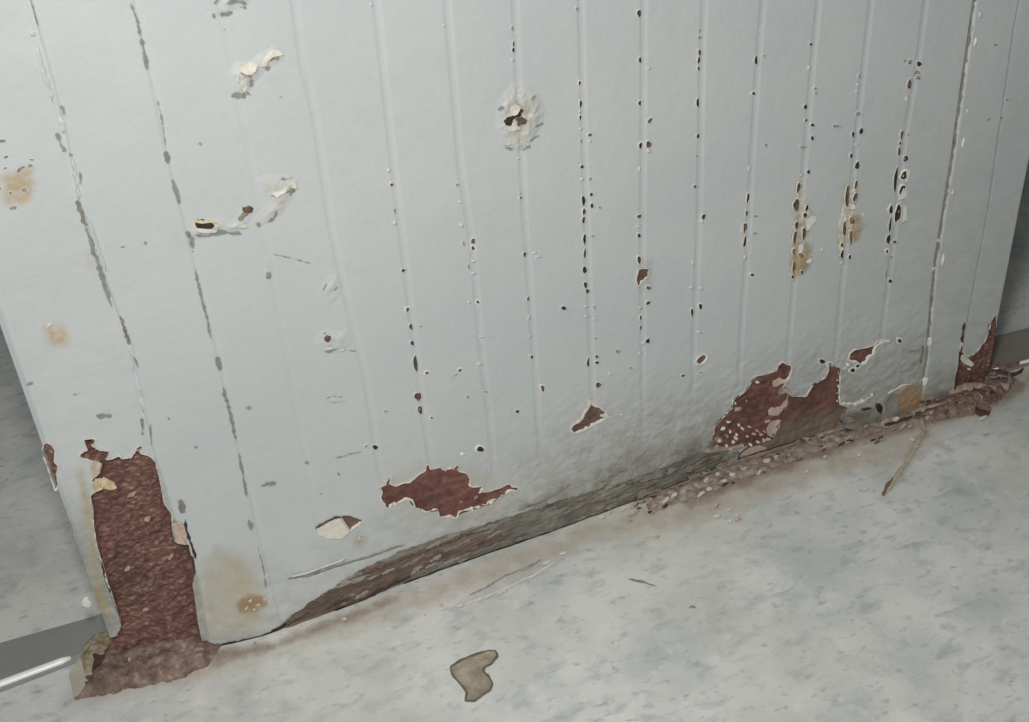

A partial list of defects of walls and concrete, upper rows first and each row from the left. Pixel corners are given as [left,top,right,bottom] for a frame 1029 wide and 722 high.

spalling [695,28,703,72]
corrosion [0,138,53,221]
peeling [502,105,522,146]
spalling [577,79,594,144]
spalling [637,139,653,153]
spalling [579,163,603,321]
spalling [636,254,652,355]
peeling [315,444,527,541]
corrosion [37,316,1029,722]
peeling [570,353,623,434]
spalling [598,337,929,523]
leakage [882,432,921,496]